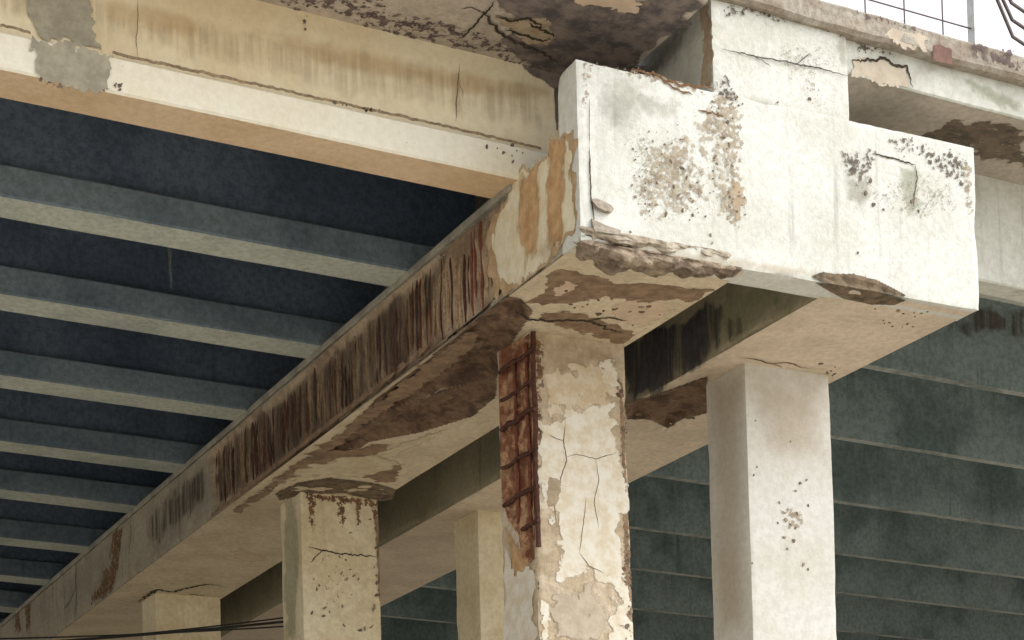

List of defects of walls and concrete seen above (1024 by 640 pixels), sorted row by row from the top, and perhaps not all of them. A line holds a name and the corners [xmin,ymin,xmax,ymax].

peeling [631,5,747,228]
spalling [851,56,913,88]
crack [872,153,918,206]
mould [889,119,1024,212]
water stain [216,277,430,503]
corrosion [233,331,482,513]
spalling [112,51,742,640]
crack [511,309,625,334]
corrosion [91,527,123,605]
corrosion [306,492,378,527]
crack [310,547,374,562]
crack [550,420,616,573]